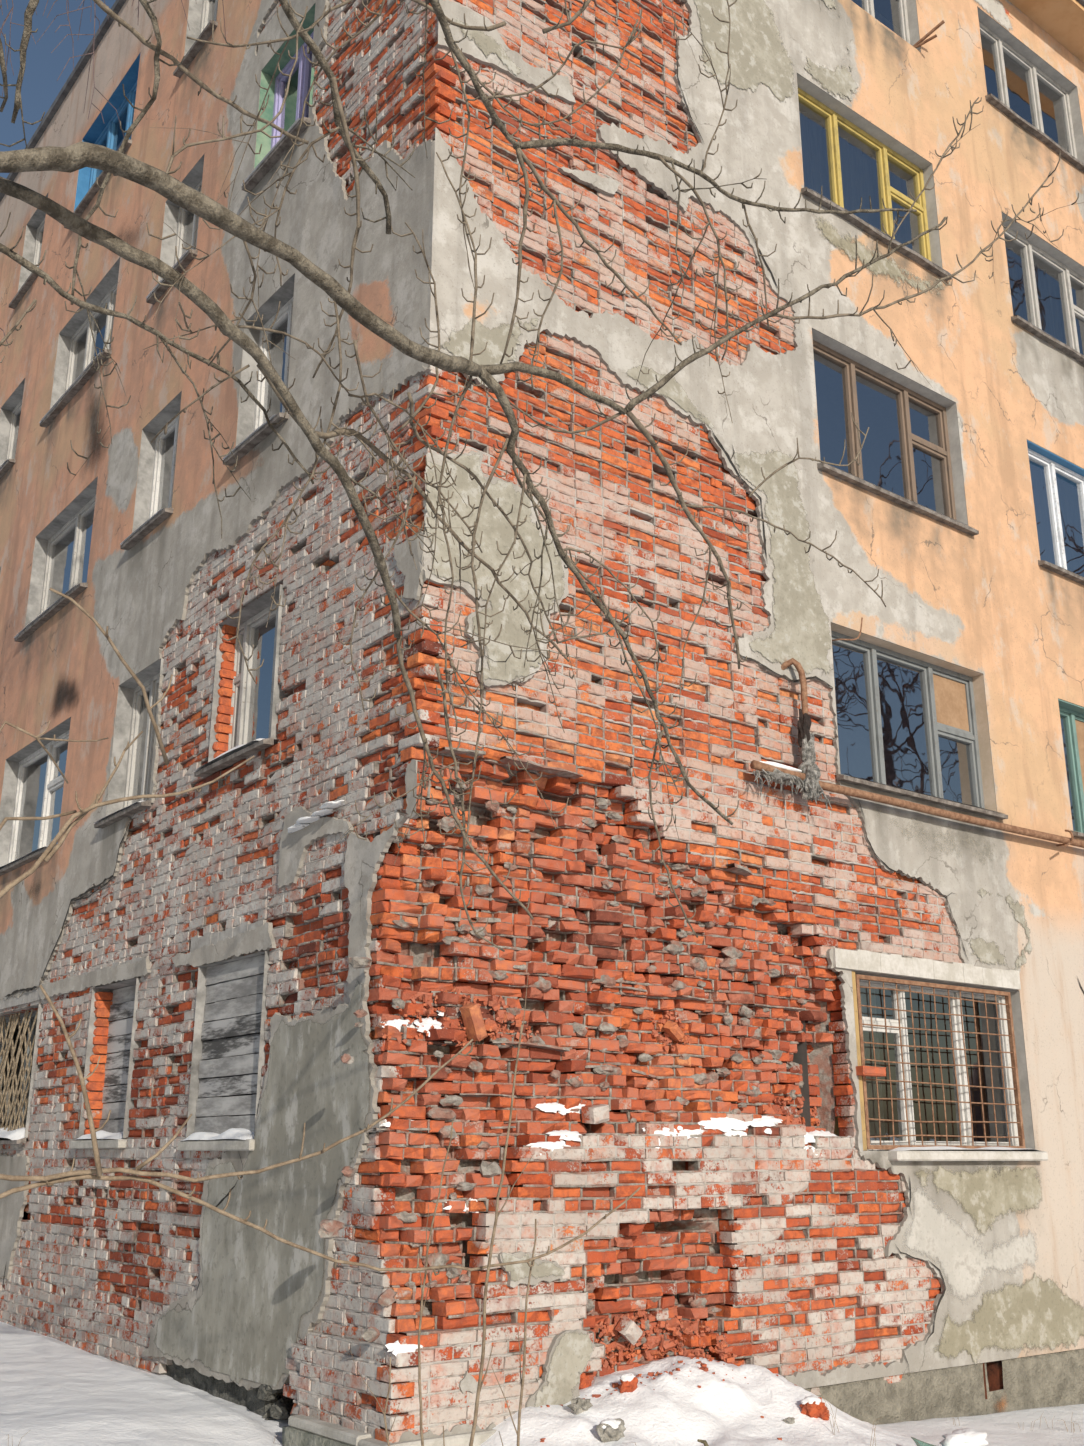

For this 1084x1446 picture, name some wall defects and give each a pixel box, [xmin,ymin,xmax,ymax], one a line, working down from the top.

spalling [312,0,859,366]
spalling [0,318,1032,1443]